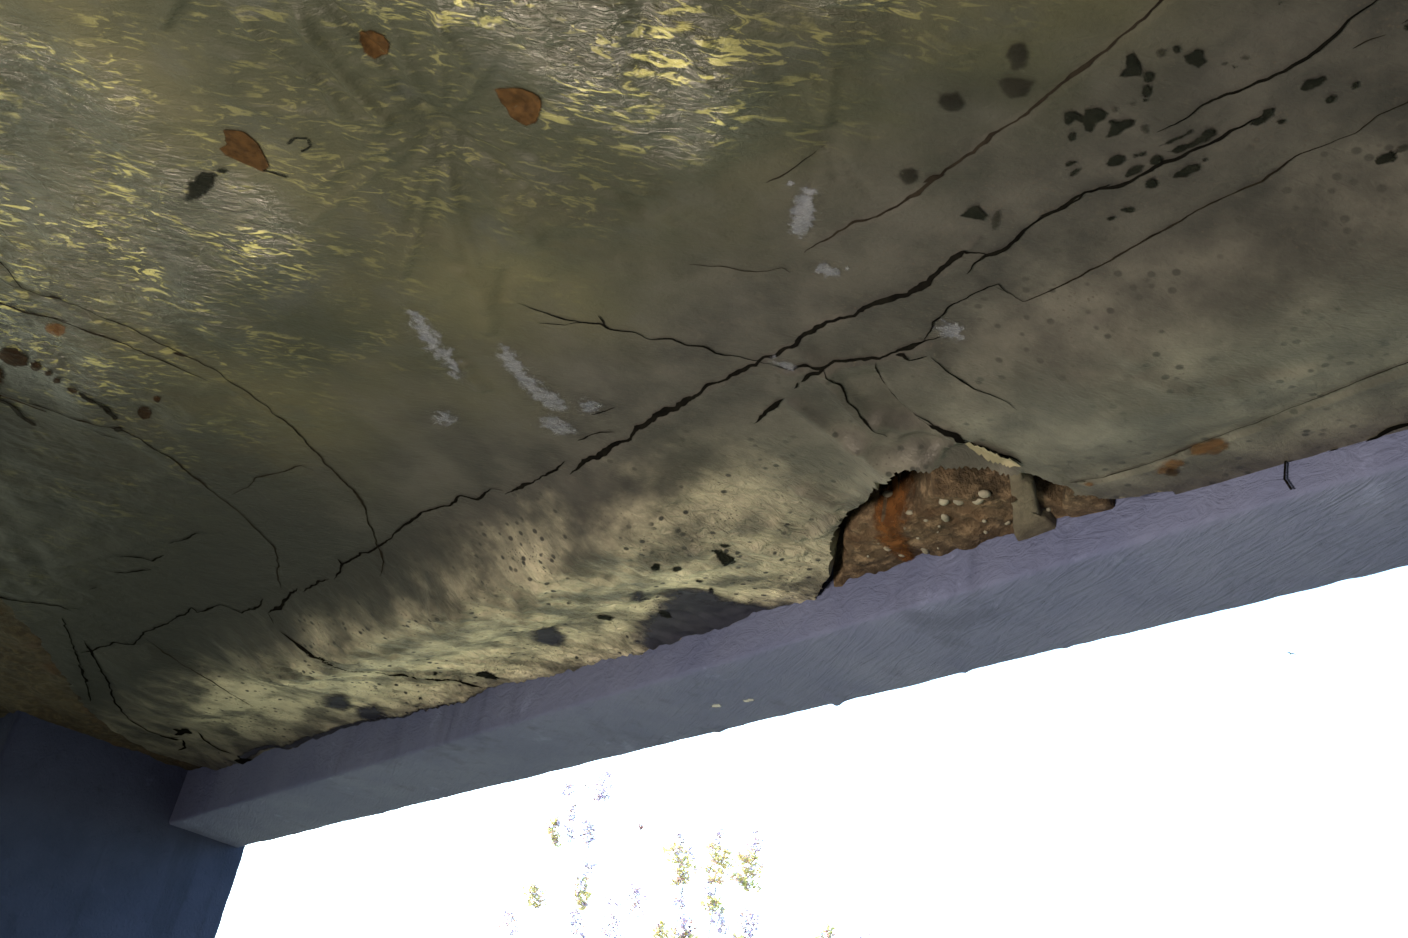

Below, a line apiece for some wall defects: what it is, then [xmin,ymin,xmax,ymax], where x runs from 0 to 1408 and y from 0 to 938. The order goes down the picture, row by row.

crack [689,0,1163,273]
crack [1158,0,1408,132]
crack [0,102,1408,764]
spalling [829,442,1115,587]
water stain [532,627,565,646]
water stain [630,588,794,650]